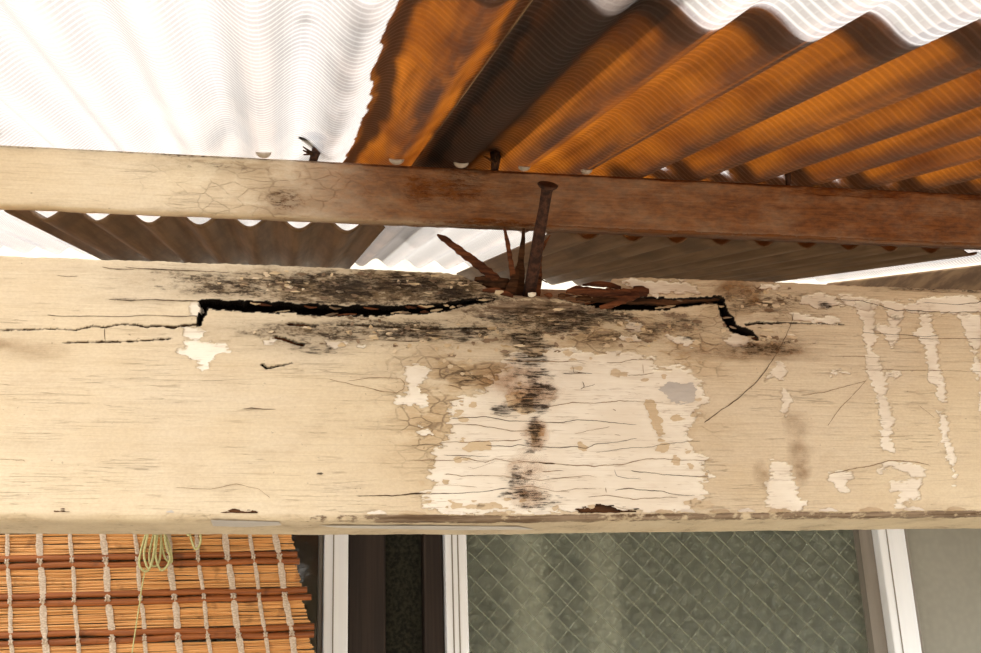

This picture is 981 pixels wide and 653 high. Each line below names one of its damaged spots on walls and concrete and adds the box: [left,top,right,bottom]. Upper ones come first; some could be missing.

crack [104,266,228,274]
peeling [176,302,232,371]
crack [3,282,493,343]
peeling [253,331,304,346]
water stain [272,274,471,300]
water stain [384,307,633,453]
peeling [319,308,808,530]
peeling [728,283,981,511]
water stain [501,467,558,508]